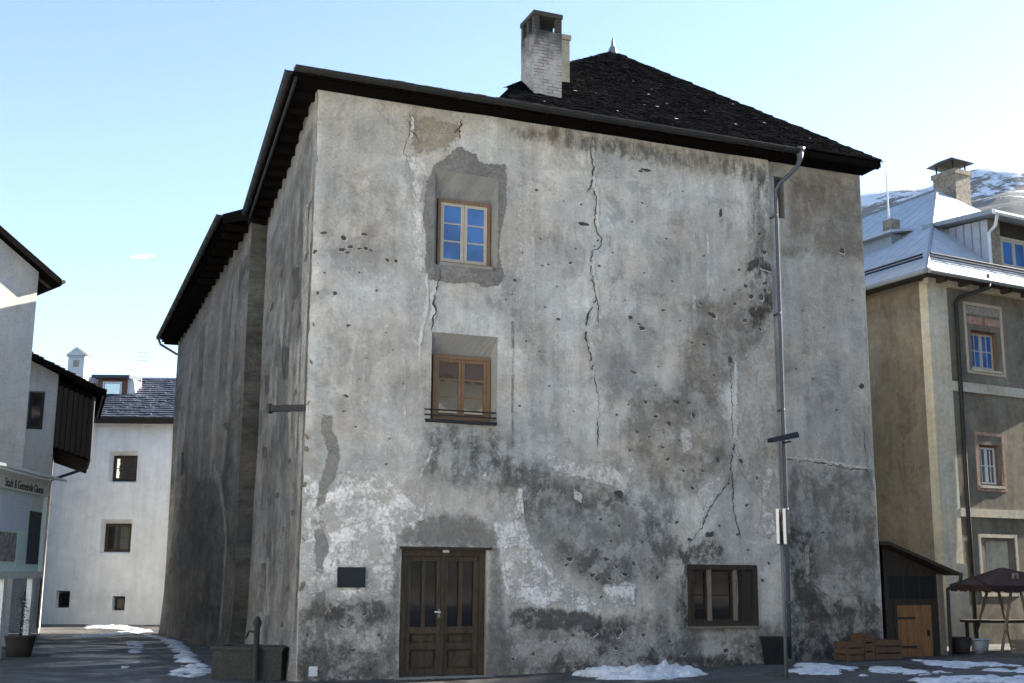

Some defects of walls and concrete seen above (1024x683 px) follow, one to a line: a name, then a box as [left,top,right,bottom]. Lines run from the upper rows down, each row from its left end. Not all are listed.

crack [403,109,420,161]
peeling [407,117,459,282]
crack [415,271,441,365]
crack [584,138,603,446]
peeling [280,201,435,641]
peeling [547,449,634,498]
crack [684,361,741,558]
peeling [491,496,636,613]
leakage [510,608,626,672]
leakage [638,653,742,667]
leakage [678,541,723,627]
leakage [790,529,882,662]